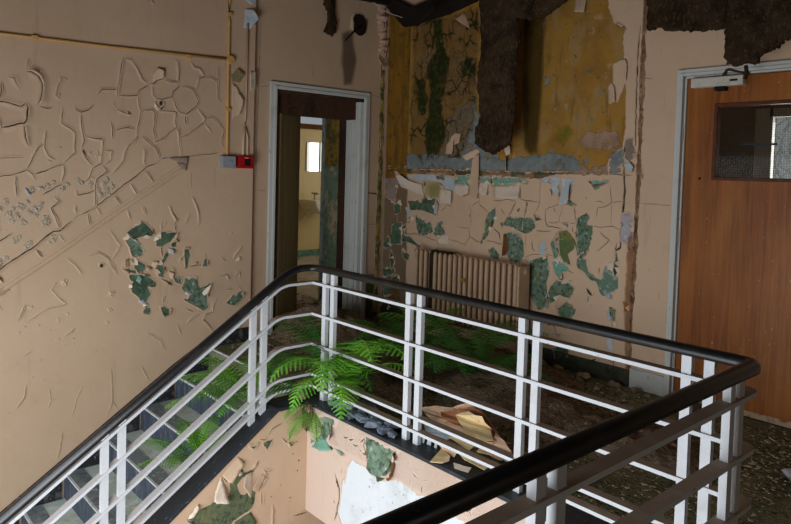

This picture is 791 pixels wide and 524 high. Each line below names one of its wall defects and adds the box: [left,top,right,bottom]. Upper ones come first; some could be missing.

peeling [345,0,648,331]
spalling [627,343,645,371]